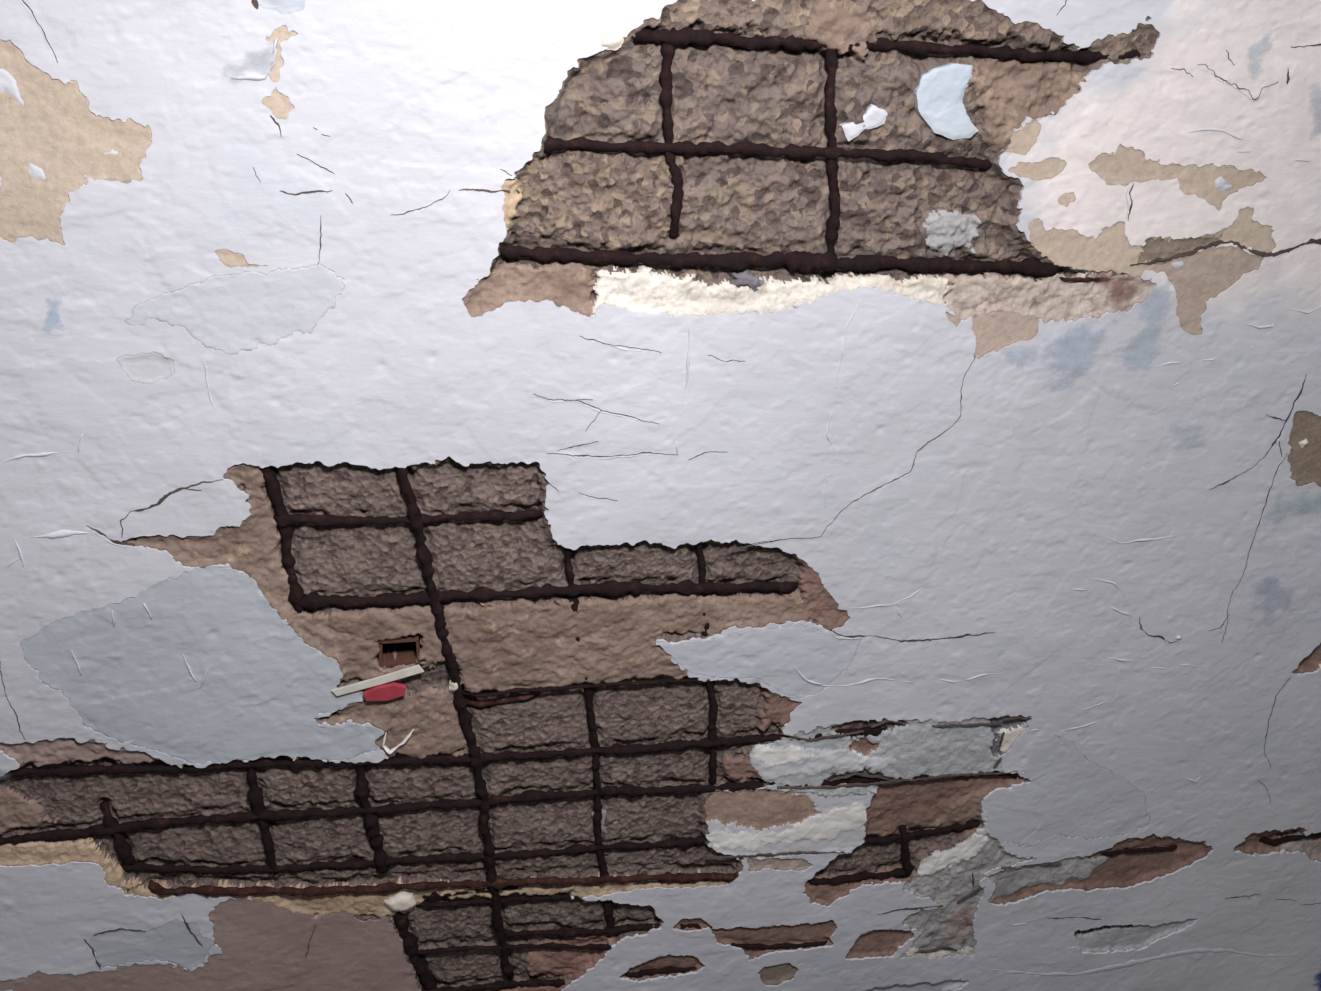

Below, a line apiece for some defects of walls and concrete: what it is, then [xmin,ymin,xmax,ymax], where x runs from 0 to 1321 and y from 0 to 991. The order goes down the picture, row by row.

peeling [257,0,307,119]
crack [1171,44,1321,102]
peeling [0,39,152,245]
spalling [462,0,1276,359]
crack [1130,238,1321,266]
crack [731,356,977,551]
crack [1210,374,1308,642]
peeling [1287,410,1321,487]
spalling [1292,643,1321,674]
spalling [0,456,1212,991]
spalling [1233,827,1321,862]